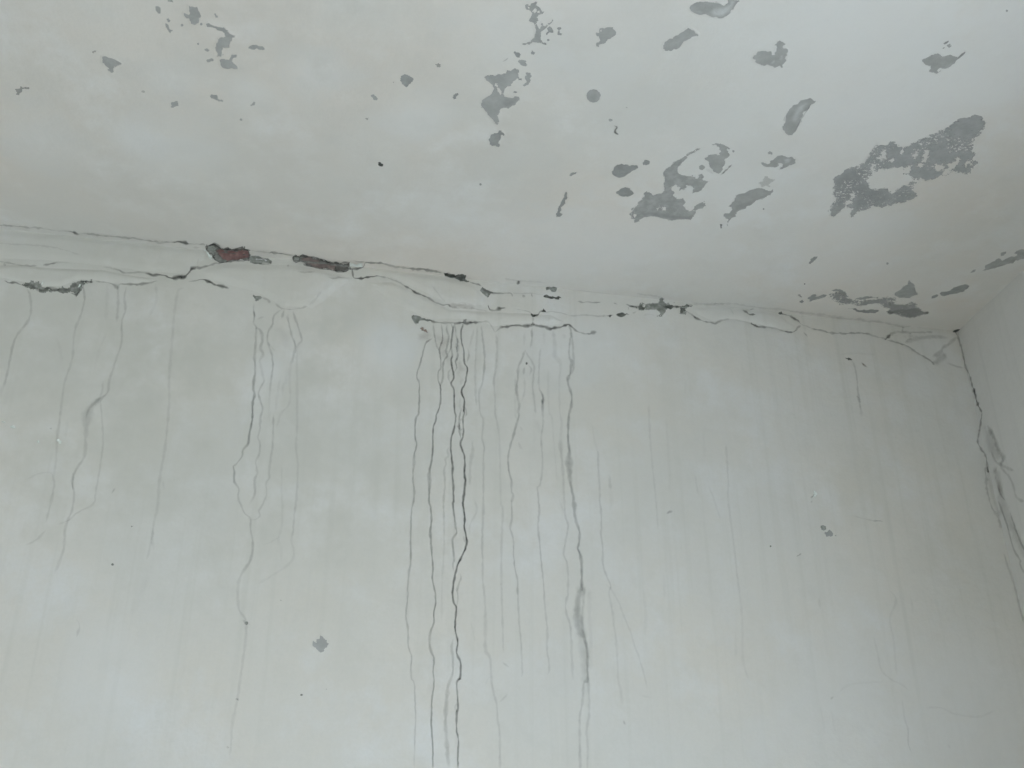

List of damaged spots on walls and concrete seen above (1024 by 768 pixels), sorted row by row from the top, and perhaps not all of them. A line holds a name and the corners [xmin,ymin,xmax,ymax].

peeling [479,0,562,148]
peeling [751,39,790,69]
peeling [920,41,968,75]
peeling [780,96,818,136]
peeling [610,142,734,223]
peeling [828,113,990,219]
peeling [722,186,775,224]
flaking render [22,279,92,296]
crack [148,242,224,287]
crack [350,263,375,280]
crack [411,289,572,330]
damp [452,426,468,680]